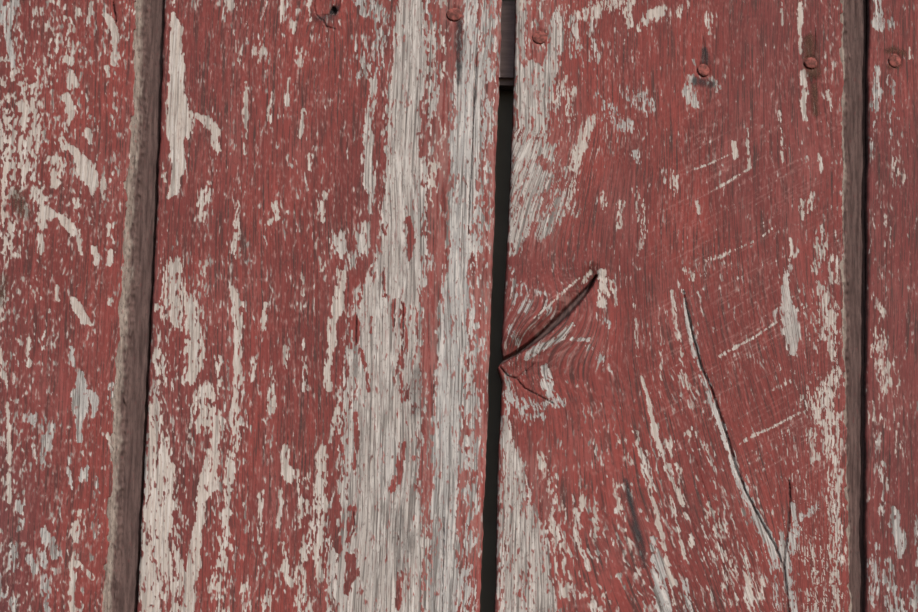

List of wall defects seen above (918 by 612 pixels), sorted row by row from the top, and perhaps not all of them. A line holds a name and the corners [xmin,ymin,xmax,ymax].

peeling [0,0,121,266]
peeling [161,0,221,199]
peeling [505,0,690,329]
peeling [6,402,94,612]
peeling [139,257,258,612]
peeling [276,0,501,612]
crack [499,276,597,404]
peeling [496,364,600,612]
peeling [617,431,693,612]
peeling [641,376,694,564]
crack [683,292,793,612]
peeling [670,224,847,612]